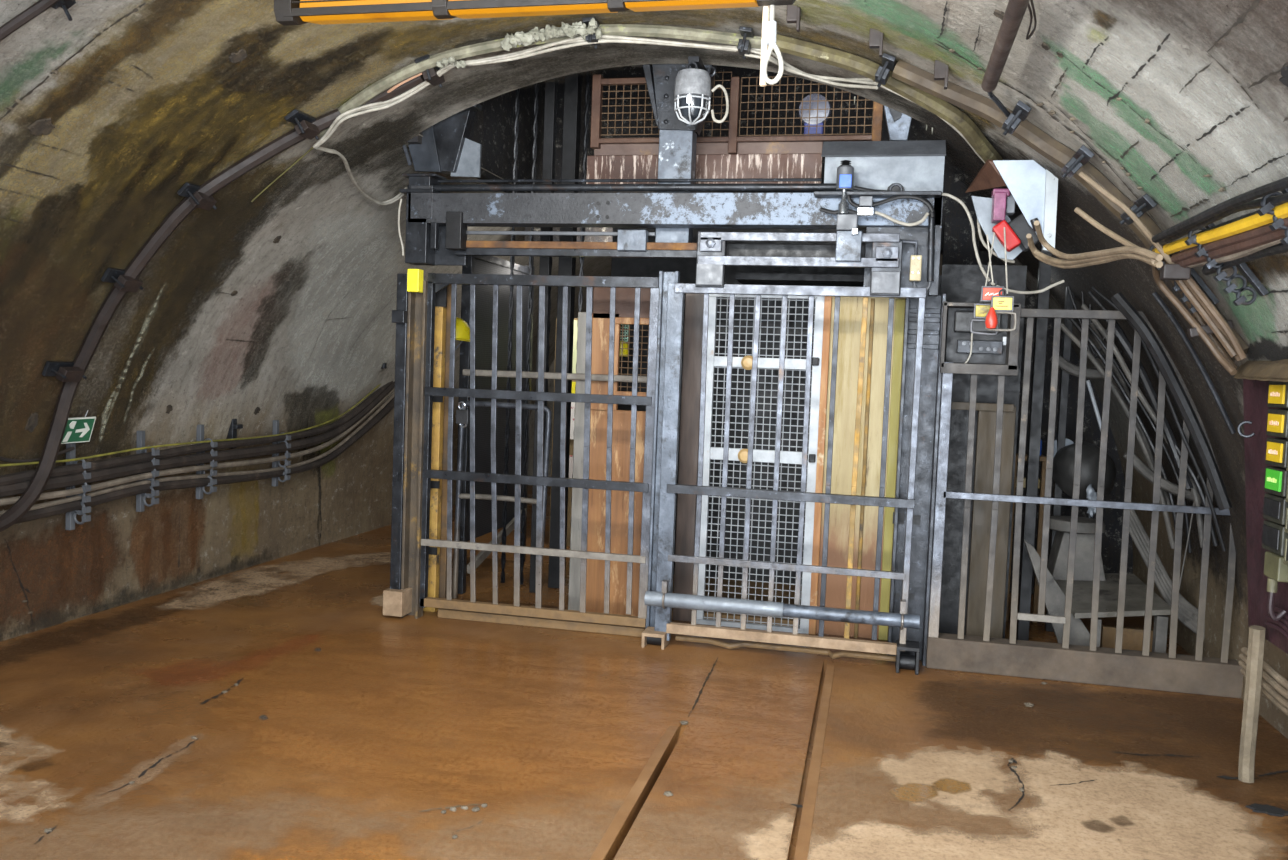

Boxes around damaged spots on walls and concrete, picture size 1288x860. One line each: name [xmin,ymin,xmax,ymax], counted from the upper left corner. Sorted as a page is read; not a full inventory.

water stain [952,104,993,131]
water stain [0,0,936,472]
water stain [92,552,267,613]
crack [96,677,244,796]
crack [1008,758,1024,810]
crack [1116,752,1288,779]
crack [35,825,57,844]